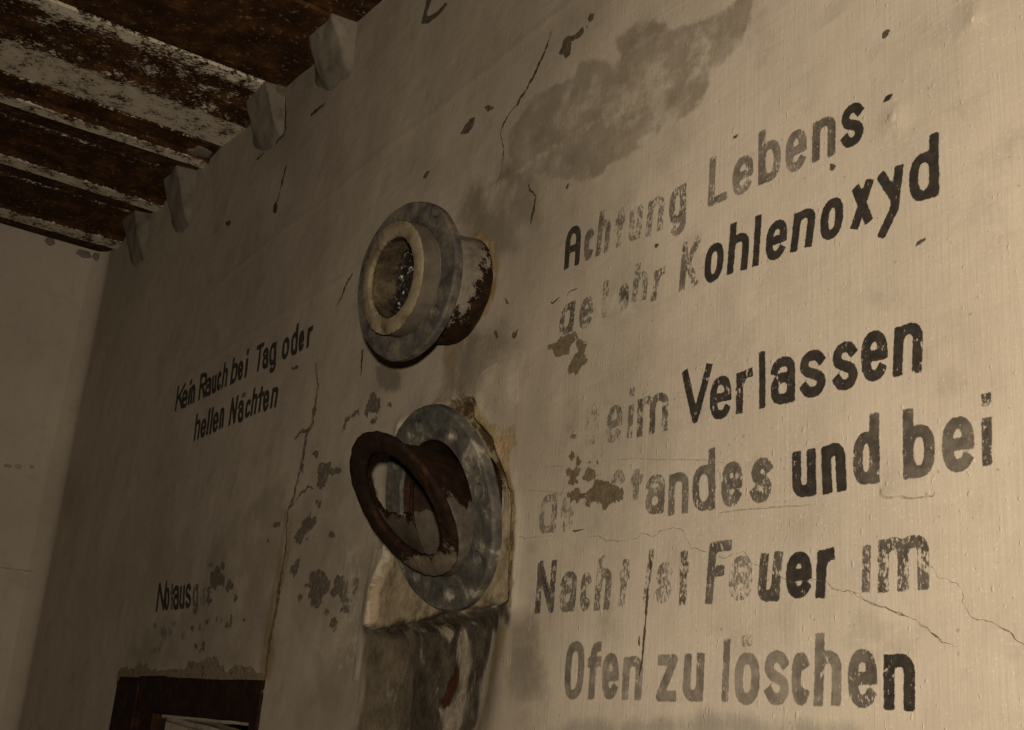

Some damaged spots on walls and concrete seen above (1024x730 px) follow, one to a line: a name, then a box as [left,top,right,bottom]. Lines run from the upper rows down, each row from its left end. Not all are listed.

crack [496,31,552,186]
crack [528,184,536,224]
flaking render [547,332,588,375]
crack [264,363,319,680]
peeling [290,392,515,633]
flaking render [566,434,624,510]